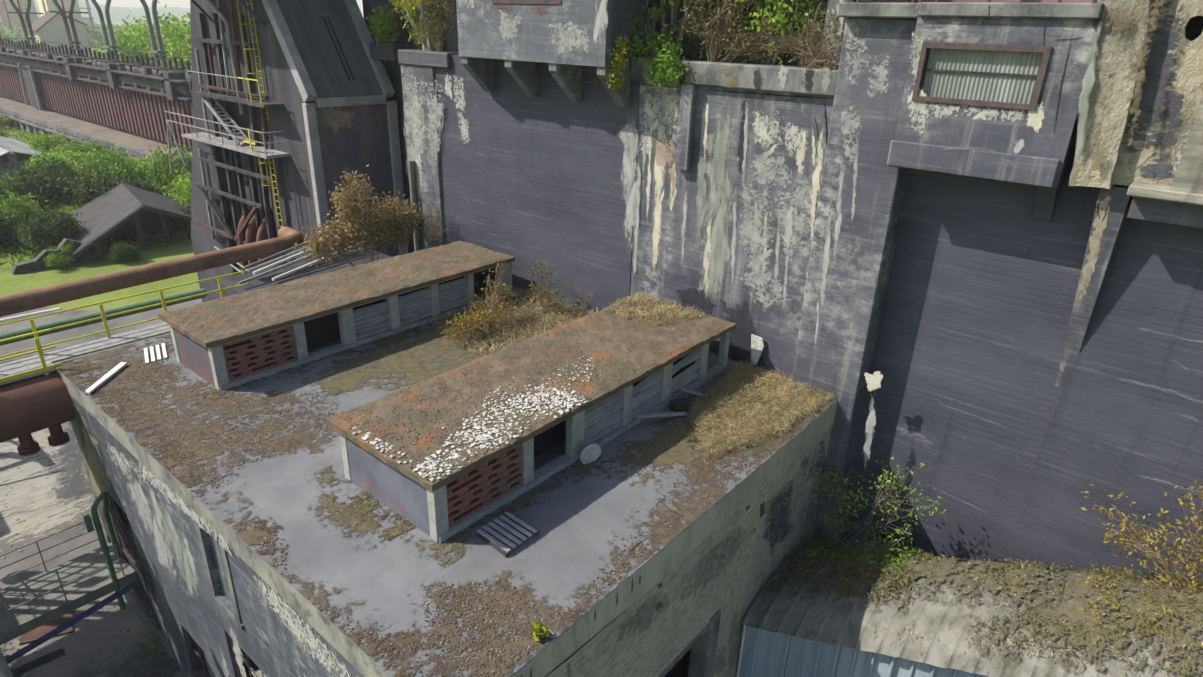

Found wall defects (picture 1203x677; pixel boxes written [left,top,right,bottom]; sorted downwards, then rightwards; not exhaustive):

leakage [412,95,425,202]
leakage [778,66,789,89]
leakage [804,67,831,93]
peeling [841,106,862,170]
peeling [844,24,891,97]
peeling [907,29,1045,154]
peeling [1105,0,1190,180]
leakage [620,70,794,368]
leakage [796,127,859,348]
spalling [863,371,883,466]